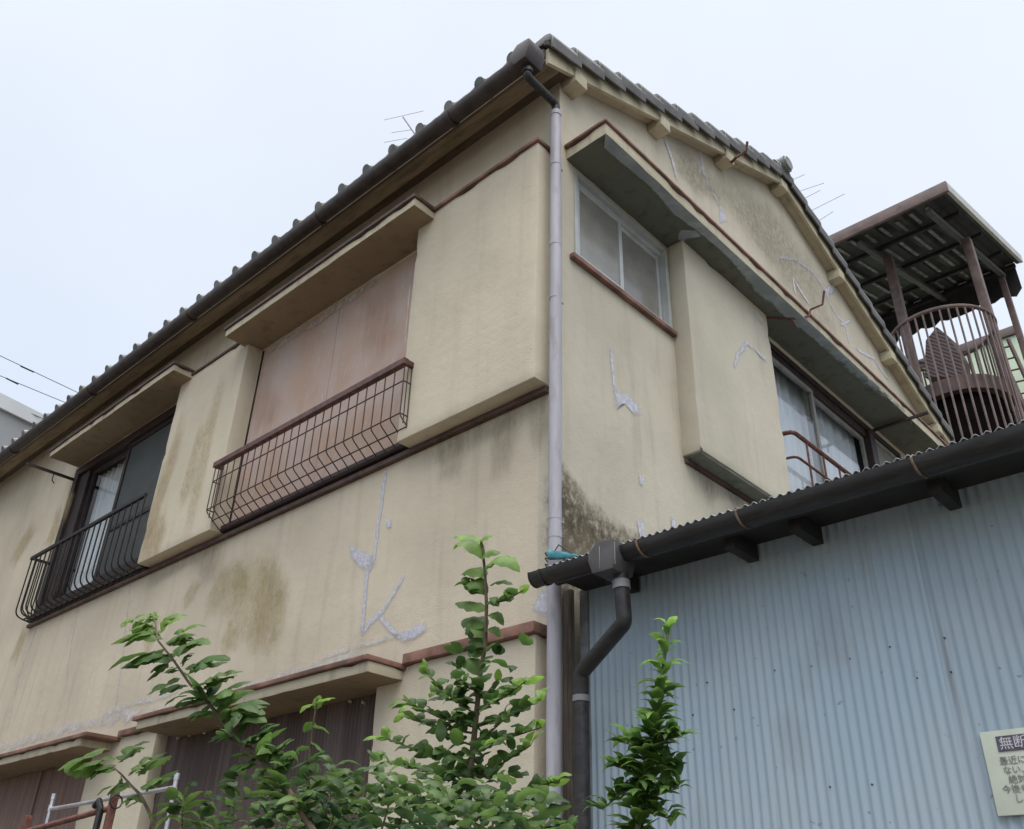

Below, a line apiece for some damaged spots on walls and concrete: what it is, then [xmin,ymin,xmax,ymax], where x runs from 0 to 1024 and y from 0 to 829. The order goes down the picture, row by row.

crack [700,151,726,222]
crack [780,255,888,379]
crack [610,350,639,413]
crack [350,473,425,640]
leakage [562,473,634,561]